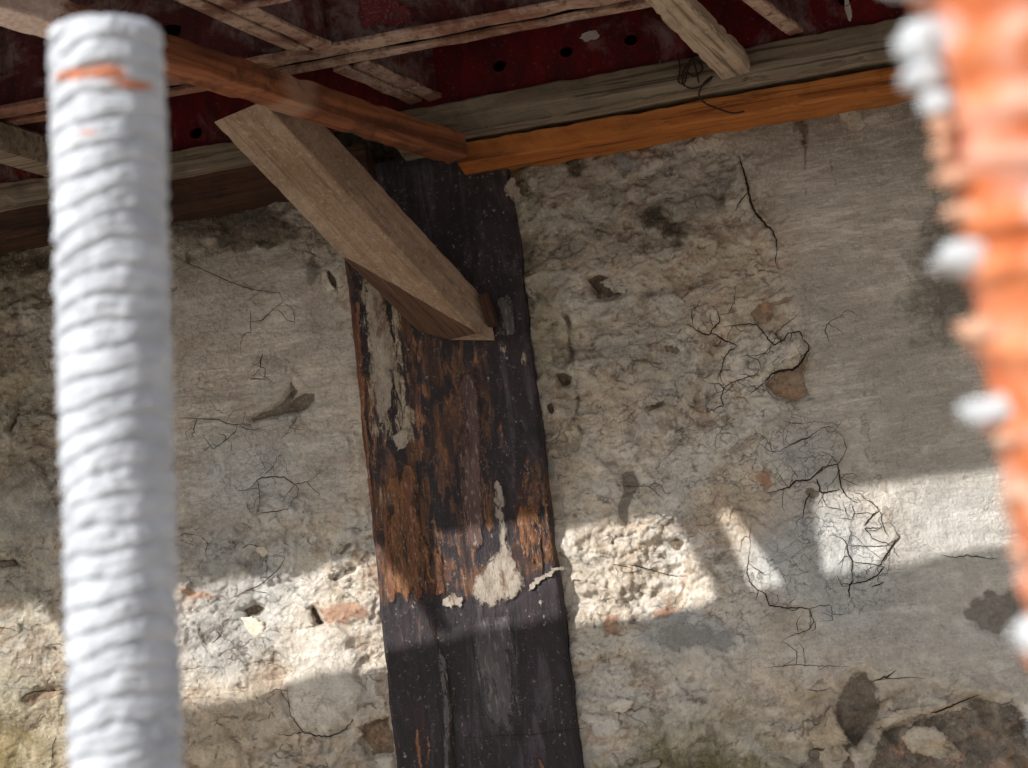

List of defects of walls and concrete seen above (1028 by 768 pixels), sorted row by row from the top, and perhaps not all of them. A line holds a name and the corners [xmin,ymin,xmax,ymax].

crack [736,156,778,268]
crack [176,257,295,380]
peeling [364,282,396,423]
crack [179,402,319,515]
peeling [392,427,409,451]
peeling [442,371,564,609]
crack [687,287,900,691]
spalling [801,673,1028,768]